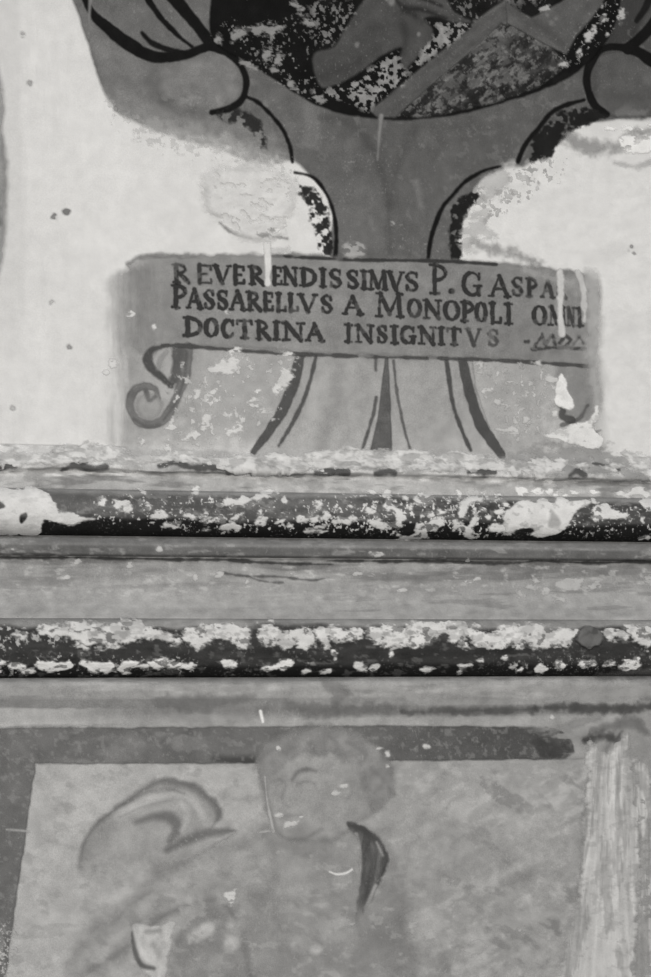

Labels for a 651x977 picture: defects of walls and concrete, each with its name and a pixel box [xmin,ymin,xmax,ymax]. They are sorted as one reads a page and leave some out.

peeling [214,0,482,110]
peeling [504,0,550,11]
peeling [559,2,625,68]
flaking render [564,124,651,167]
peeling [461,159,563,265]
peeling [0,347,651,541]
peeling [517,575,602,603]
peeling [0,617,651,676]